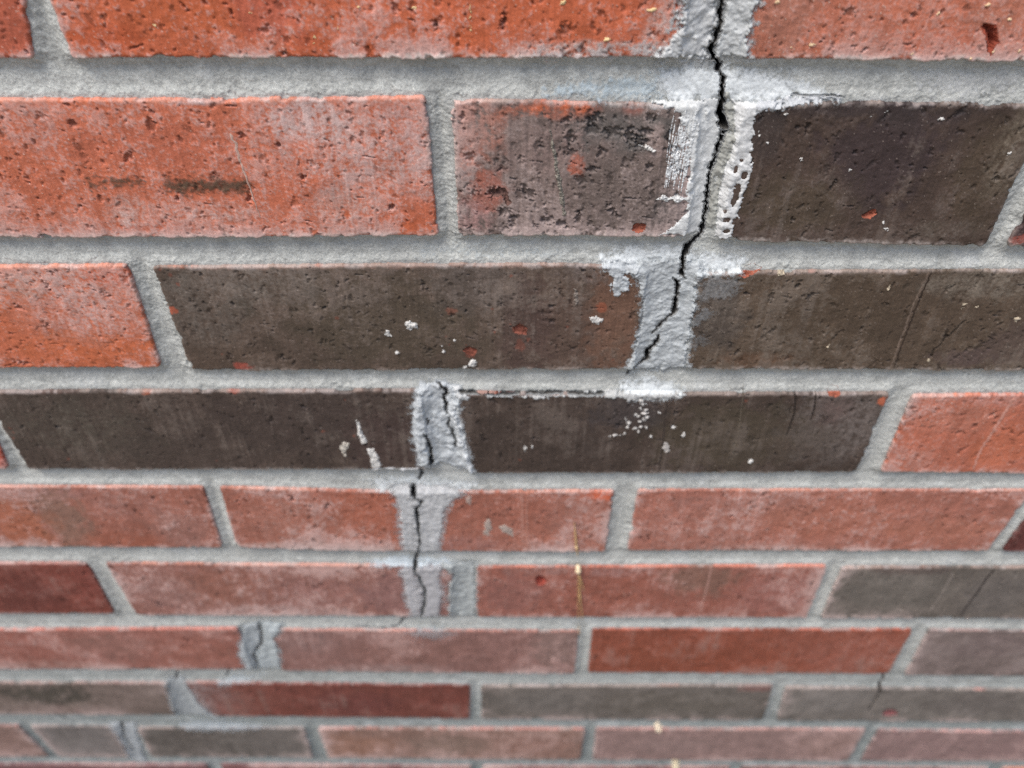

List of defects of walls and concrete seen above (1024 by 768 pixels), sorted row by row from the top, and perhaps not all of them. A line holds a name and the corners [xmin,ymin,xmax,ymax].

crack [626,0,730,375]
crack [356,381,605,629]
crack [252,622,264,667]